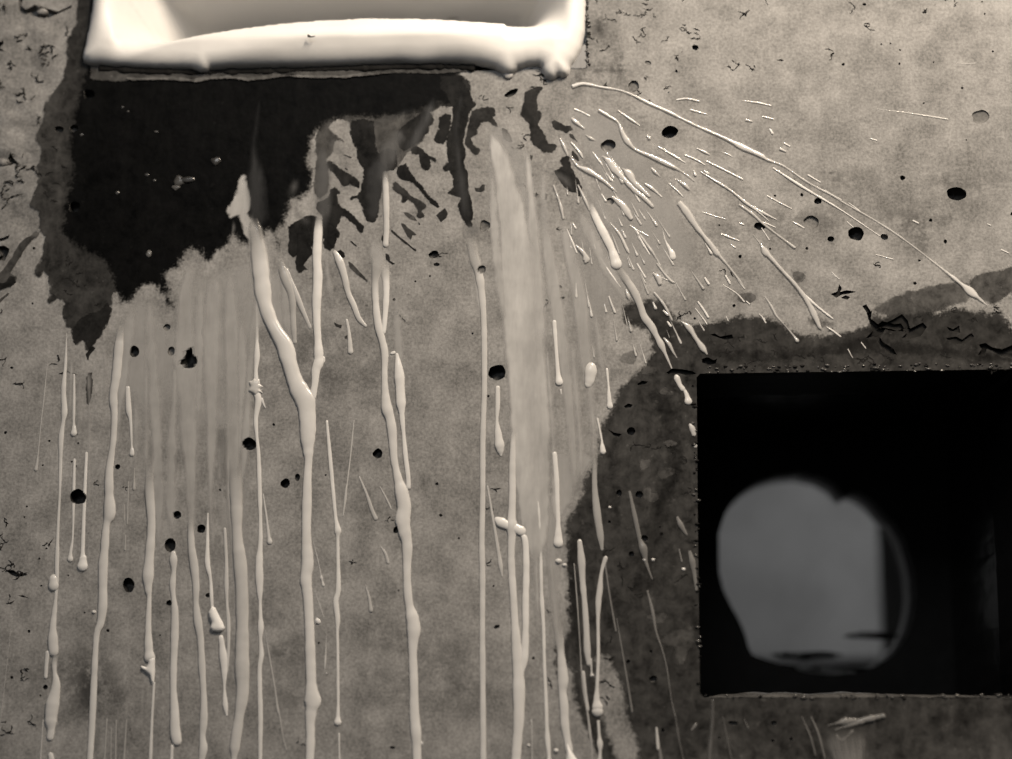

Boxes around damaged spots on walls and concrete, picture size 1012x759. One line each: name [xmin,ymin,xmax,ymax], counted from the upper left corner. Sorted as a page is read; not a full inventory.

leakage [0,0,512,533]
leakage [520,86,1012,759]